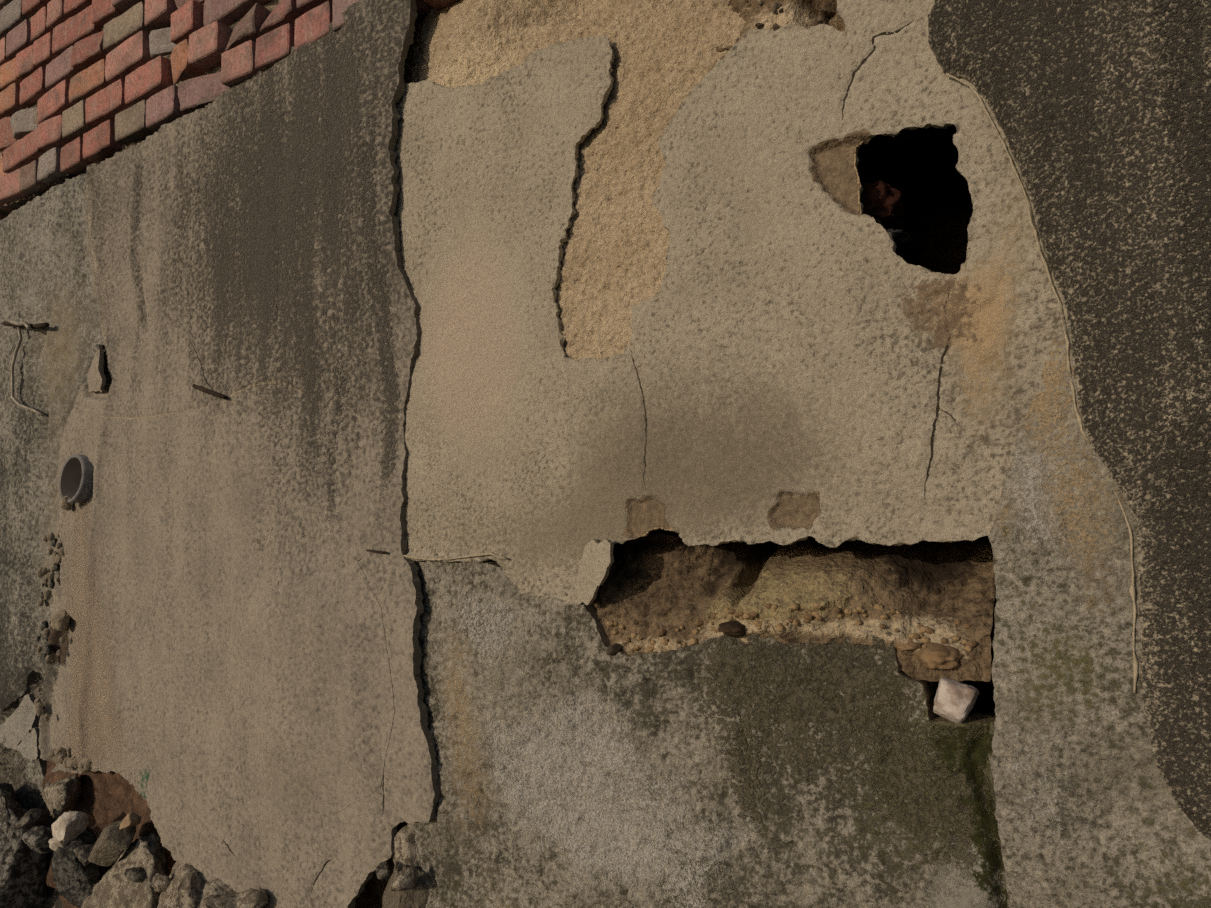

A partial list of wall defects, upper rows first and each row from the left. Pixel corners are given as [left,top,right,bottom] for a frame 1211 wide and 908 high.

crack [842,17,916,119]
spalling [403,0,846,360]
spalling [809,129,871,216]
crack [909,293,956,498]
water stain [928,0,1211,840]
flaking render [577,496,679,605]
spalling [0,693,161,843]
spalling [46,850,78,908]
spalling [99,863,115,881]